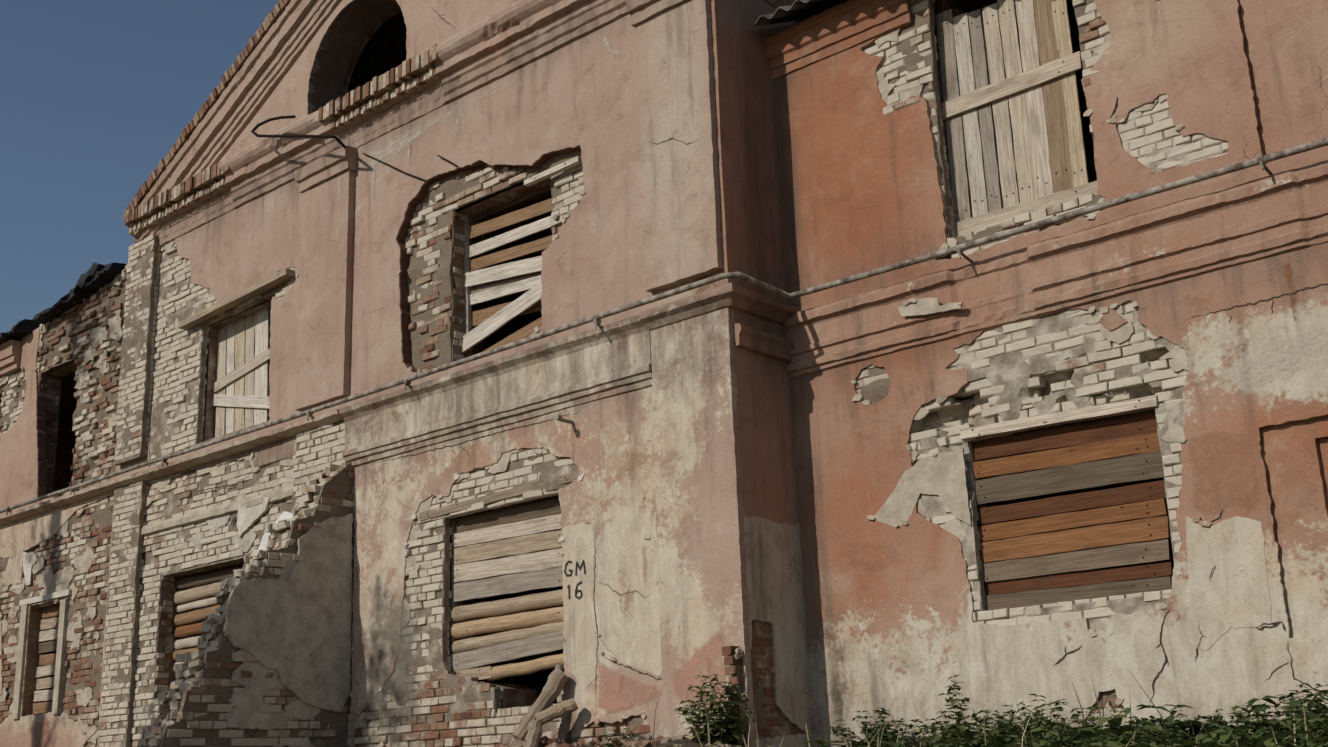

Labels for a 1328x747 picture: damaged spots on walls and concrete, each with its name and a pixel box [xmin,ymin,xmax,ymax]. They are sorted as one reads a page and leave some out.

spalling [124,157,231,234]
spalling [398,151,586,373]
spalling [863,0,1105,260]
spalling [1071,0,1228,174]
spalling [0,264,128,747]
spalling [131,240,346,747]
spalling [347,447,584,747]
spalling [540,689,651,744]
peeling [559,519,662,690]
crack [593,528,663,709]
spalling [851,301,1273,651]
crack [1151,612,1207,724]